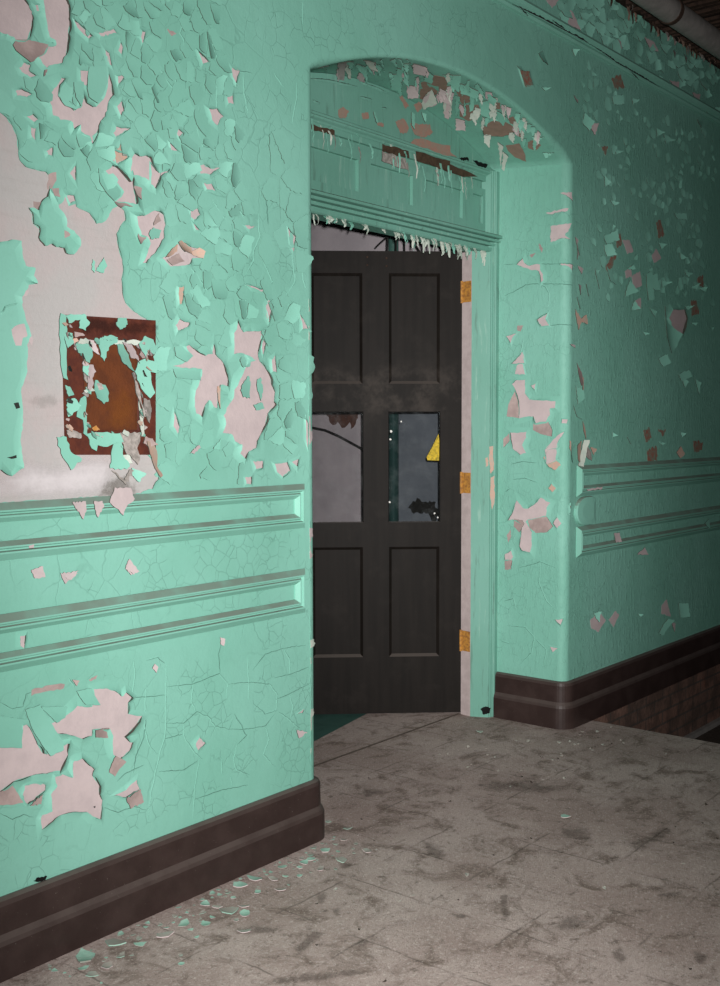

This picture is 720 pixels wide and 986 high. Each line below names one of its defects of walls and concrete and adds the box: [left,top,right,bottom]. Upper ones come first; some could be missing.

flaking render [0,0,374,519]
peeling [382,229,487,266]
peeling [320,58,553,193]
peeling [509,0,720,367]
peeling [485,325,597,570]
peeling [612,427,666,461]
peeling [0,676,151,841]
crack [105,645,308,816]
peeling [295,616,315,760]
peeling [590,611,619,632]
peeling [659,600,690,636]